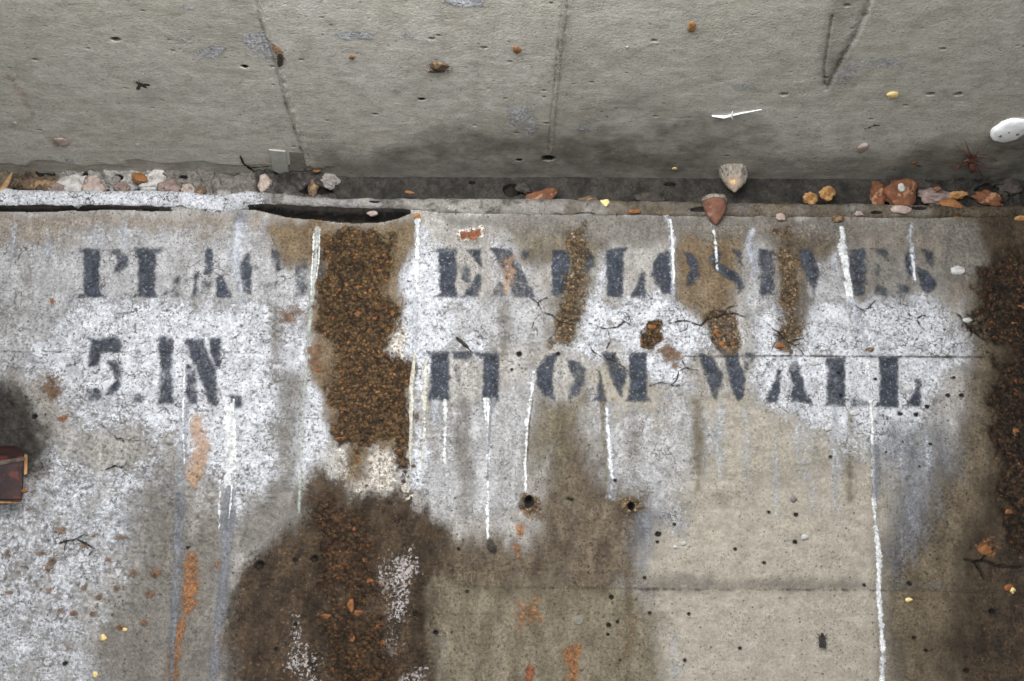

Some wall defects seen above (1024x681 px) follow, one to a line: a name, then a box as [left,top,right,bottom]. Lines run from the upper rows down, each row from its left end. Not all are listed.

rust [457,225,486,242]
crack [530,297,630,371]
crack [649,361,706,386]
rust [187,417,210,486]
damp [97,213,752,681]
damp [447,214,1024,681]
rust [168,551,201,681]